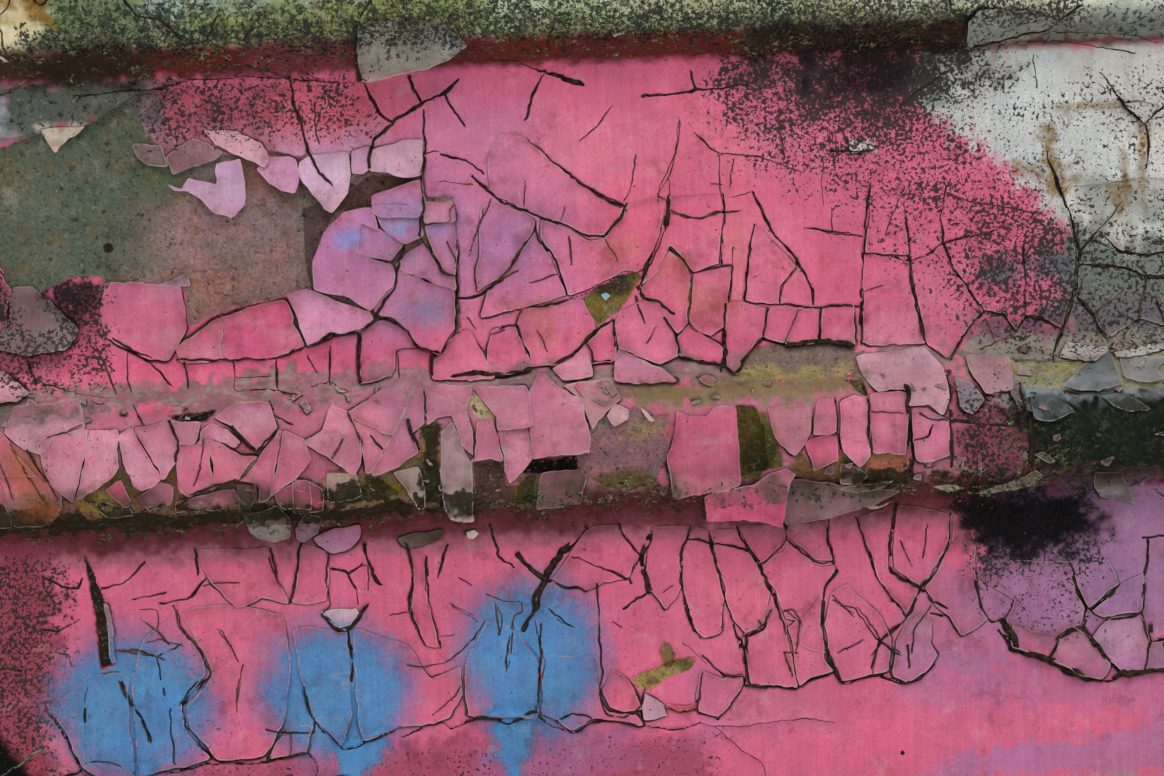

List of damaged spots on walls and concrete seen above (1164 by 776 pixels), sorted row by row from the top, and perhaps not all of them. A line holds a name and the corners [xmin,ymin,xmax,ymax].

crack [0,0,48,96]
peeling [1125,102,1159,123]
crack [26,0,1164,507]
peeling [1062,178,1164,338]
peeling [955,342,1164,421]
crack [0,424,82,507]
peeling [0,111,1076,776]
peeling [1094,457,1135,505]
crack [0,503,962,776]
crack [974,534,1164,682]
peeling [980,559,1164,679]